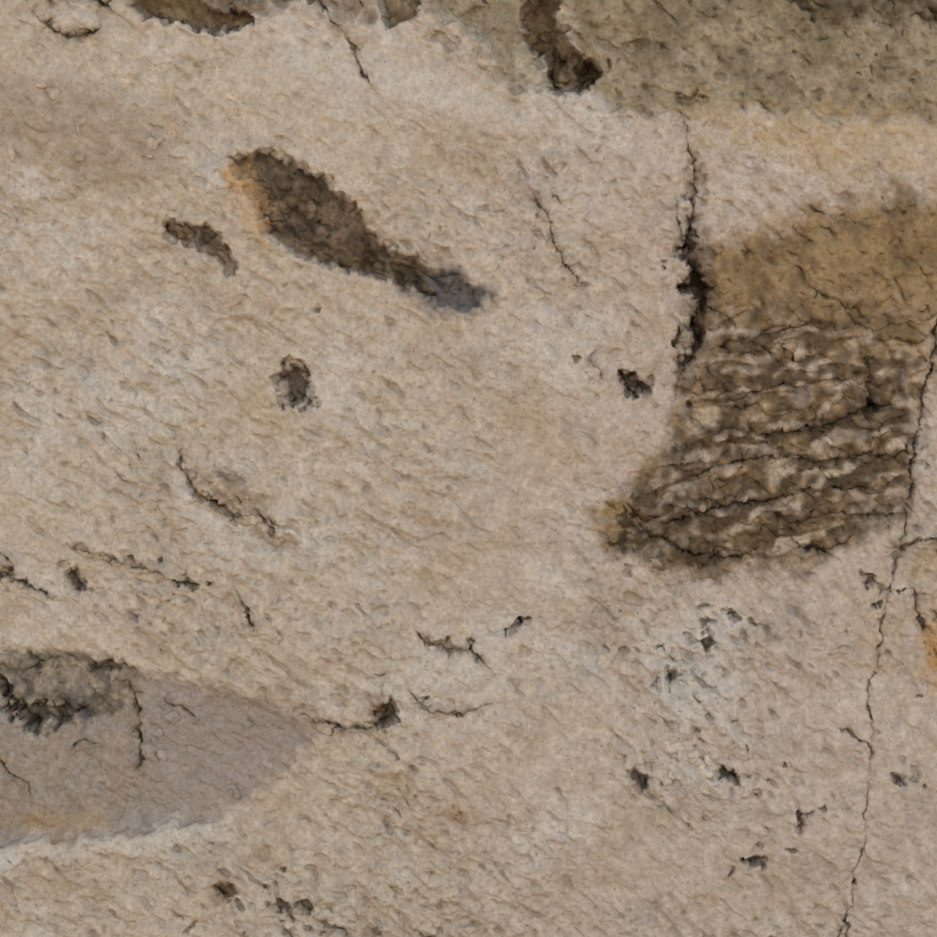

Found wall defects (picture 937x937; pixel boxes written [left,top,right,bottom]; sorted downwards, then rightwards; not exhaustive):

spalling [132,0,255,37]
spalling [521,0,604,96]
spalling [161,215,239,283]
spalling [230,146,435,297]
crack [662,116,713,403]
damp [669,224,723,378]
spalling [271,358,314,411]
damp [793,356,911,464]
crack [0,536,57,602]
crack [70,539,169,585]
damp [605,461,757,598]
crack [833,319,937,937]